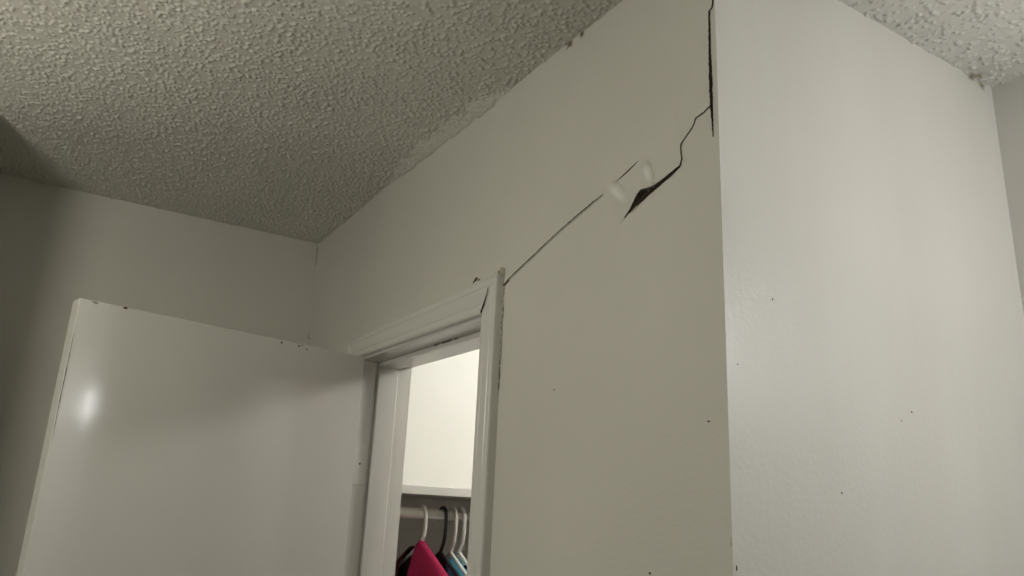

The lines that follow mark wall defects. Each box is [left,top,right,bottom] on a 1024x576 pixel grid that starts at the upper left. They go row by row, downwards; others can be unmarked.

crack [480,0,713,314]